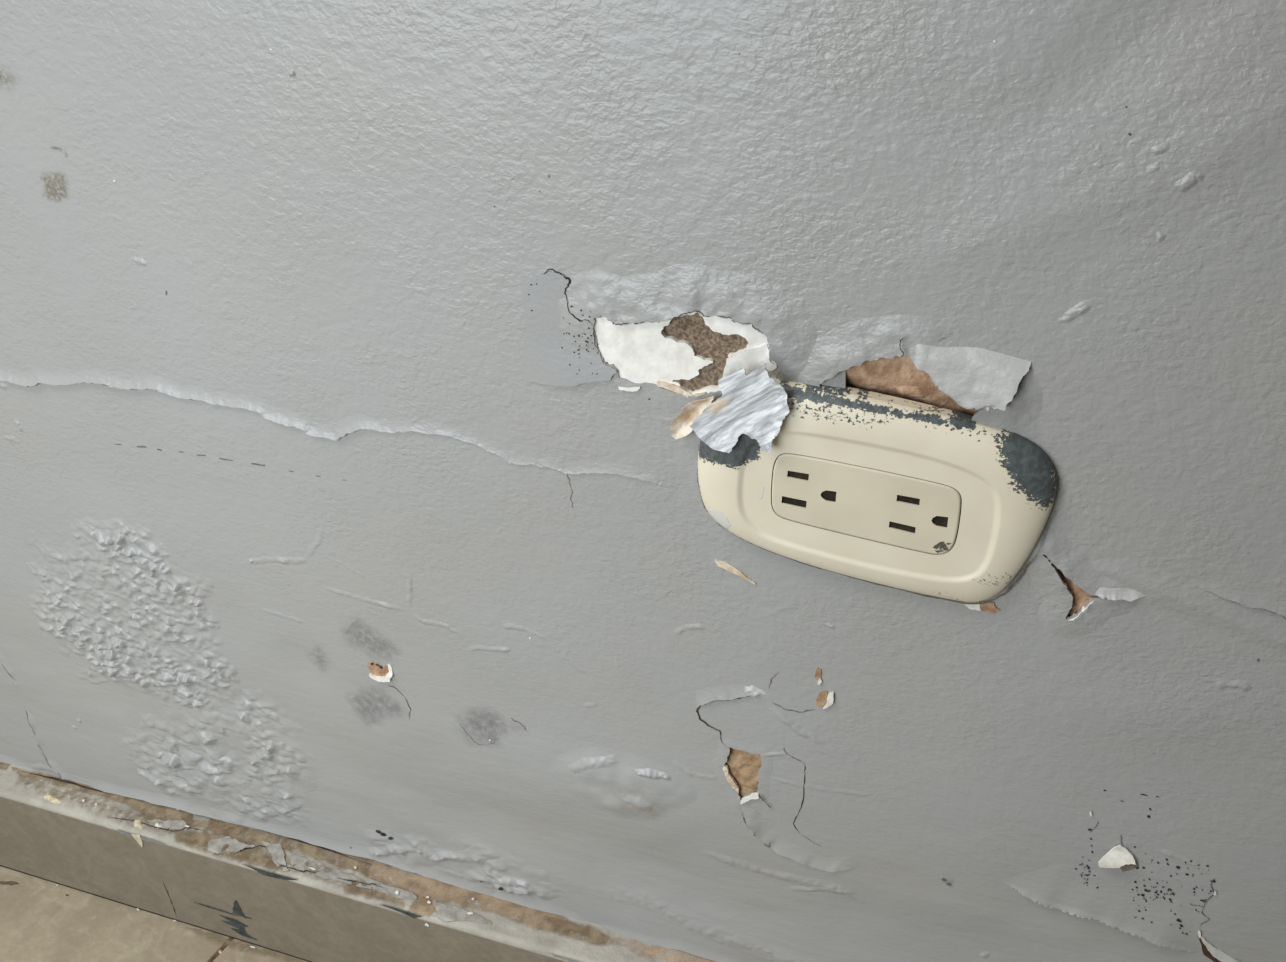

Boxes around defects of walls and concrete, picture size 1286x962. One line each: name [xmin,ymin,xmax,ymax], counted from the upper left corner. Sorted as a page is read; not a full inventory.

peeling [521,263,1043,453]
flaking render [367,662,394,682]
peeling [695,668,873,872]
peeling [1004,811,1240,962]